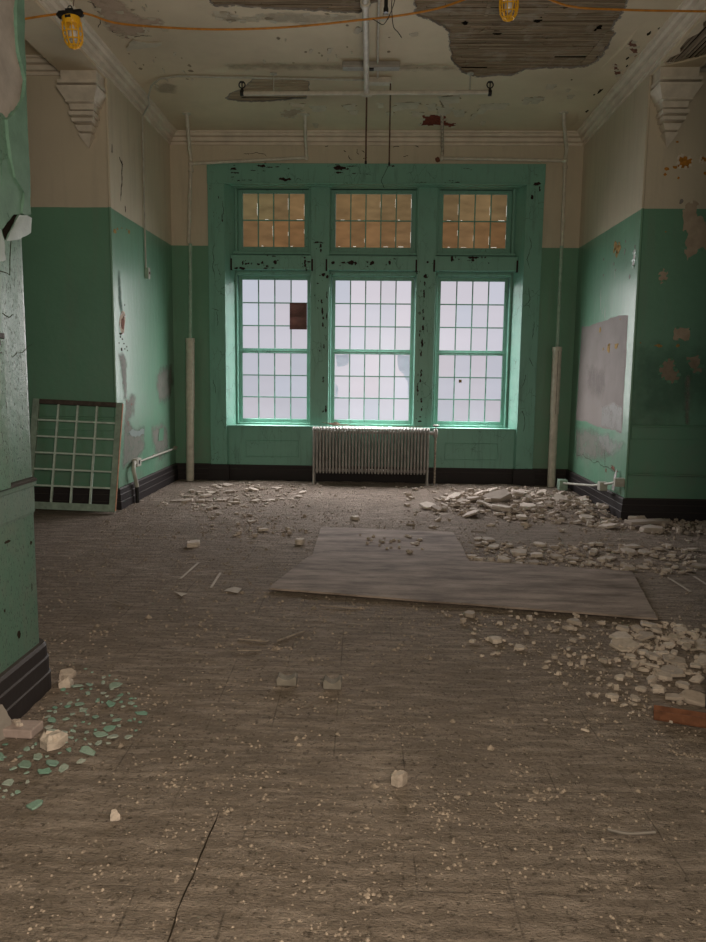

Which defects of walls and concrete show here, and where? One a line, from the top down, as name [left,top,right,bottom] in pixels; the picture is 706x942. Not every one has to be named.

spalling [650,13,706,76]
spalling [0,0,32,261]
peeling [679,199,706,261]
flaking render [576,315,628,433]